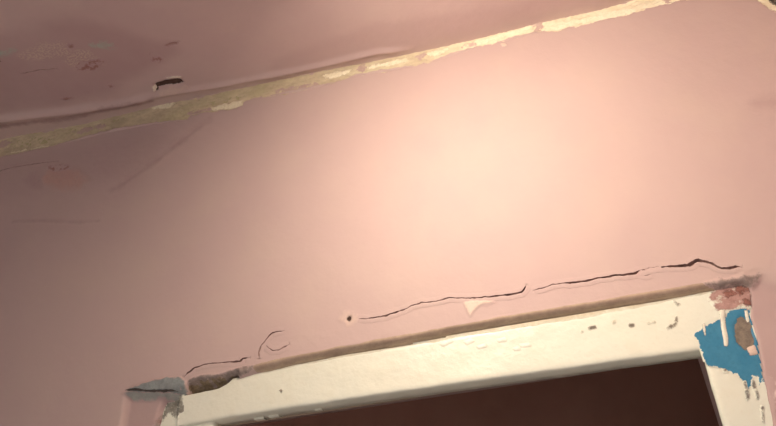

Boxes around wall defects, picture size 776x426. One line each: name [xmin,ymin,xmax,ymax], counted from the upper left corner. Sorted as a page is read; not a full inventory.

spalling [742,0,776,16]
peeling [0,0,697,159]
crack [358,254,742,323]
spalling [187,364,256,394]
crack [182,327,291,379]
peeling [694,308,765,422]